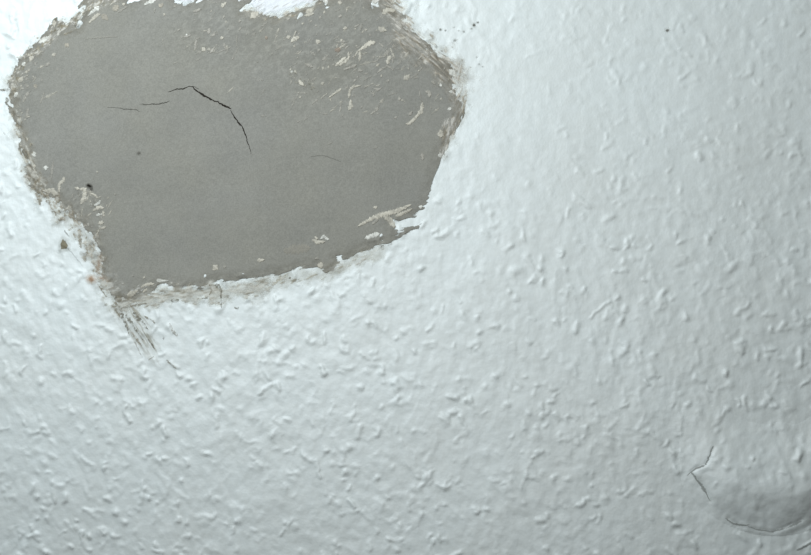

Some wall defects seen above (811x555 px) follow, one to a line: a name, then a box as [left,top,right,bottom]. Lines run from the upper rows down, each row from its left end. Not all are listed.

crack [169,86,251,151]
flaking render [0,0,467,348]